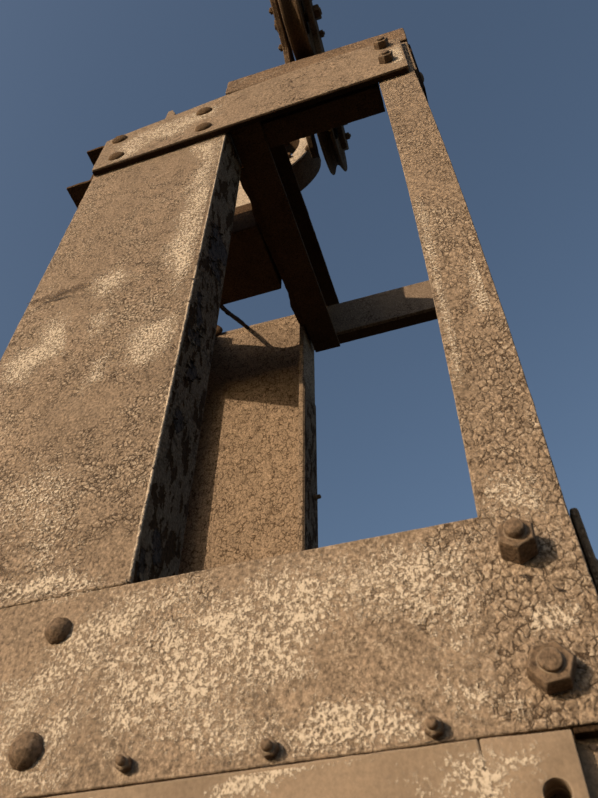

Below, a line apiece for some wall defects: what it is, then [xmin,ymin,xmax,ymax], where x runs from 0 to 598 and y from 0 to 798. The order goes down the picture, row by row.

peeling [2,310,73,388]
peeling [73,135,226,577]
peeling [415,197,463,387]
peeling [0,383,496,798]
peeling [408,742,541,798]
peeling [426,664,532,726]